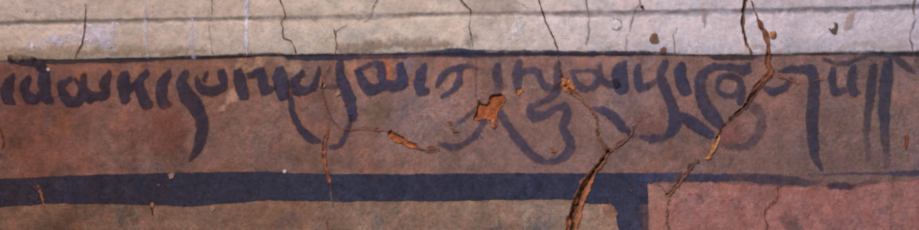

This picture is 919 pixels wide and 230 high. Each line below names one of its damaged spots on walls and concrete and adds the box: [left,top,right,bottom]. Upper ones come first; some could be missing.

crack [279,0,296,53]
crack [909,0,919,68]
spalling [387,130,417,148]
spalling [473,93,506,128]
crack [538,0,653,230]
crack [657,0,825,230]